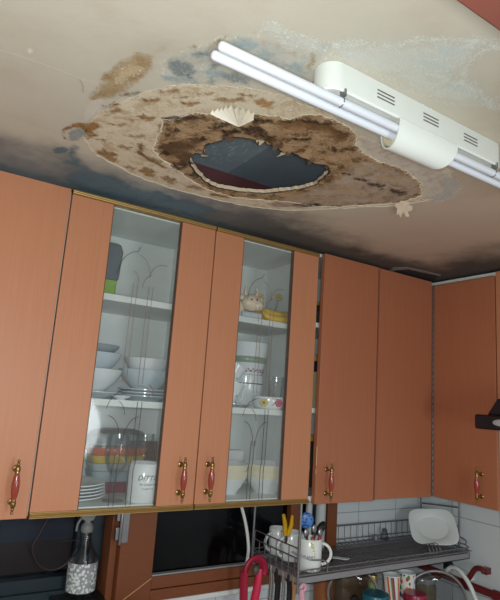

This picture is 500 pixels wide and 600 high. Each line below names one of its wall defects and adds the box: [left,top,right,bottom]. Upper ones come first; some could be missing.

leakage [89,21,500,111]
peeling [82,82,459,217]
leakage [152,112,463,208]